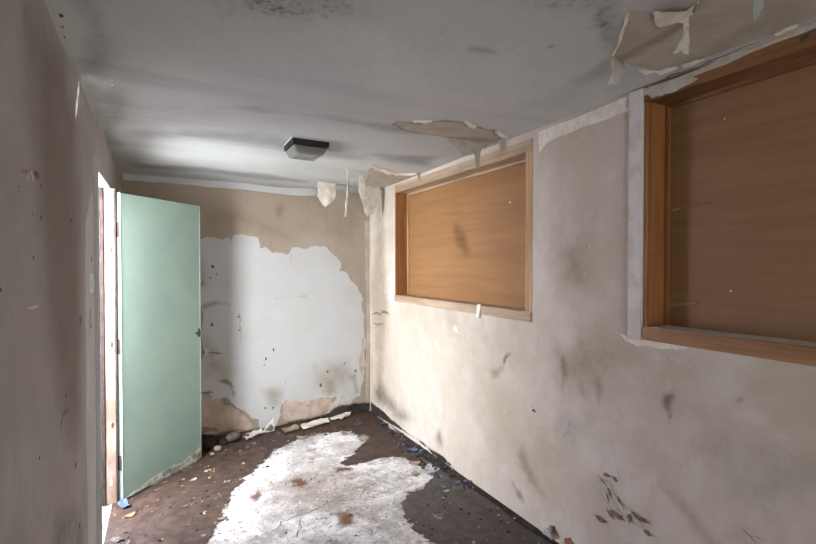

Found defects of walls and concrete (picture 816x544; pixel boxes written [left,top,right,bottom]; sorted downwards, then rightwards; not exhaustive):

peeling [200,221,370,435]
flaking render [594,472,653,537]